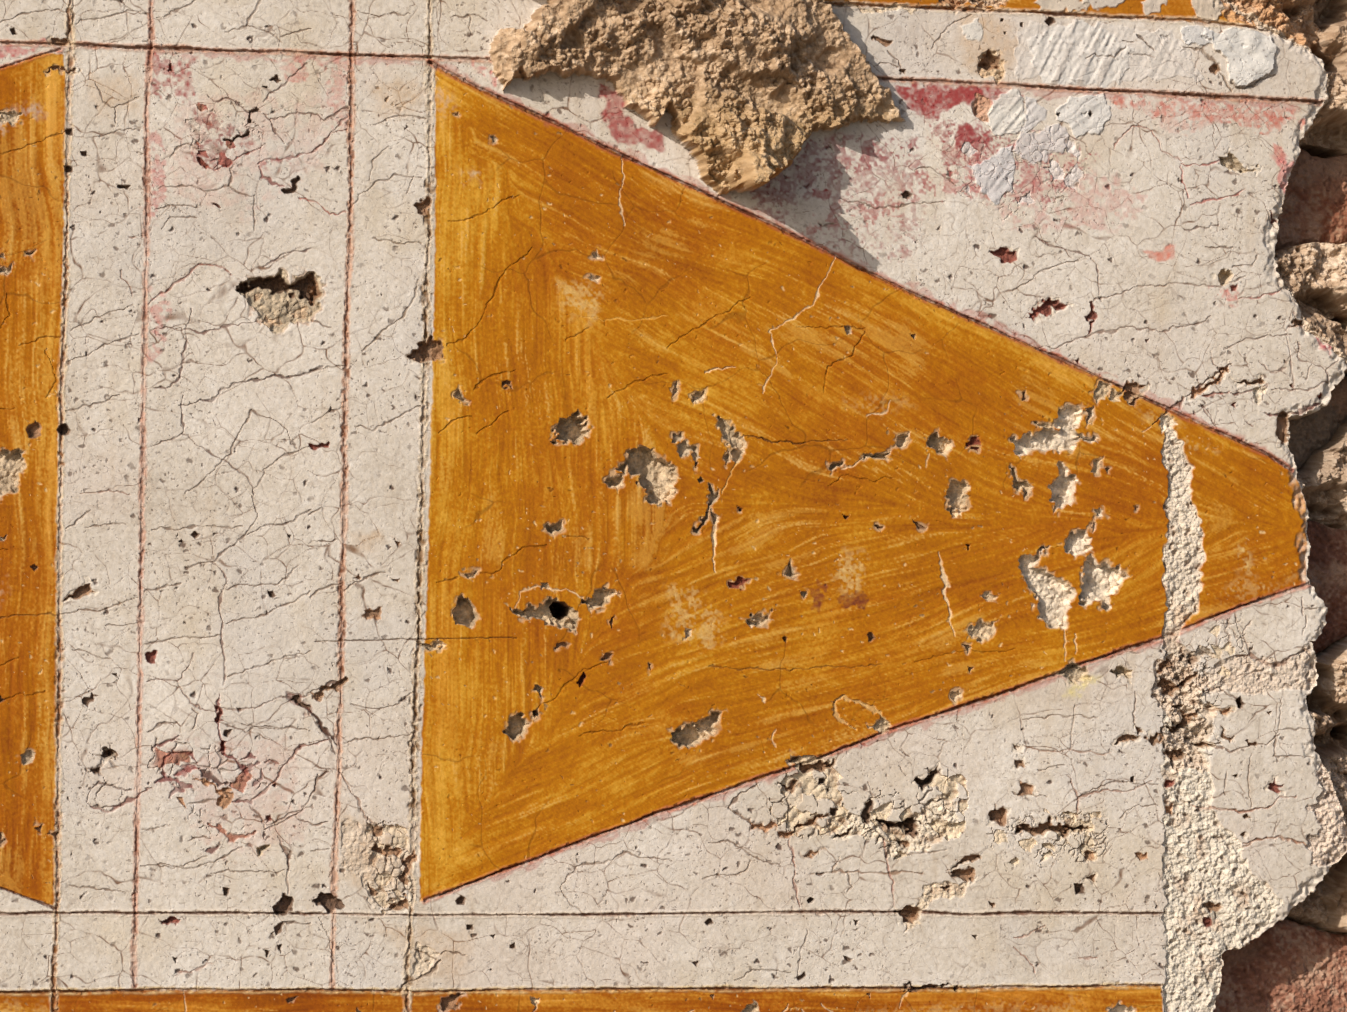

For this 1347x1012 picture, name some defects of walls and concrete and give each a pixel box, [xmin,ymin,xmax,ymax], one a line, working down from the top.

crack [129,0,427,240]
spalling [236,269,325,336]
crack [0,263,590,966]
crack [711,400,894,573]
crack [703,782,948,1012]
flaking render [749,753,970,861]
crack [938,552,956,637]
spalling [893,745,1110,933]
spalling [1018,507,1129,630]
spalling [1009,380,1221,516]
crack [1012,597,1321,847]
flaking render [1114,542,1317,816]